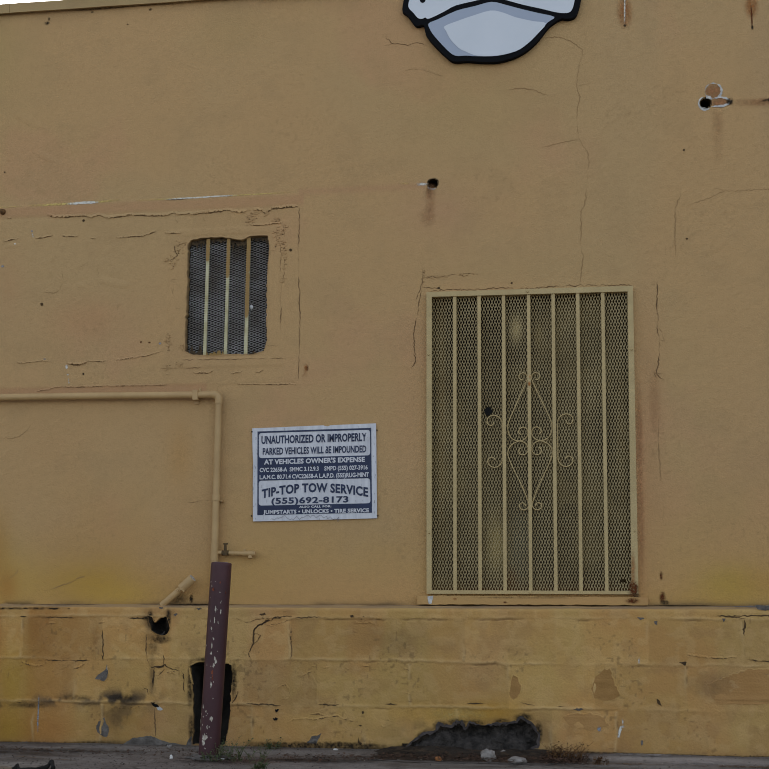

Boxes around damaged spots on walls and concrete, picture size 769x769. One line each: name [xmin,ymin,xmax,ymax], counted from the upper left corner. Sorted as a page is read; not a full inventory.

crack [525,36,631,289]
peeling [47,204,298,283]
crack [412,273,504,367]
crack [655,284,664,379]
spalling [124,581,234,749]
crack [232,693,280,706]
crack [238,616,325,657]
spalling [403,716,540,750]
peeling [591,668,621,701]